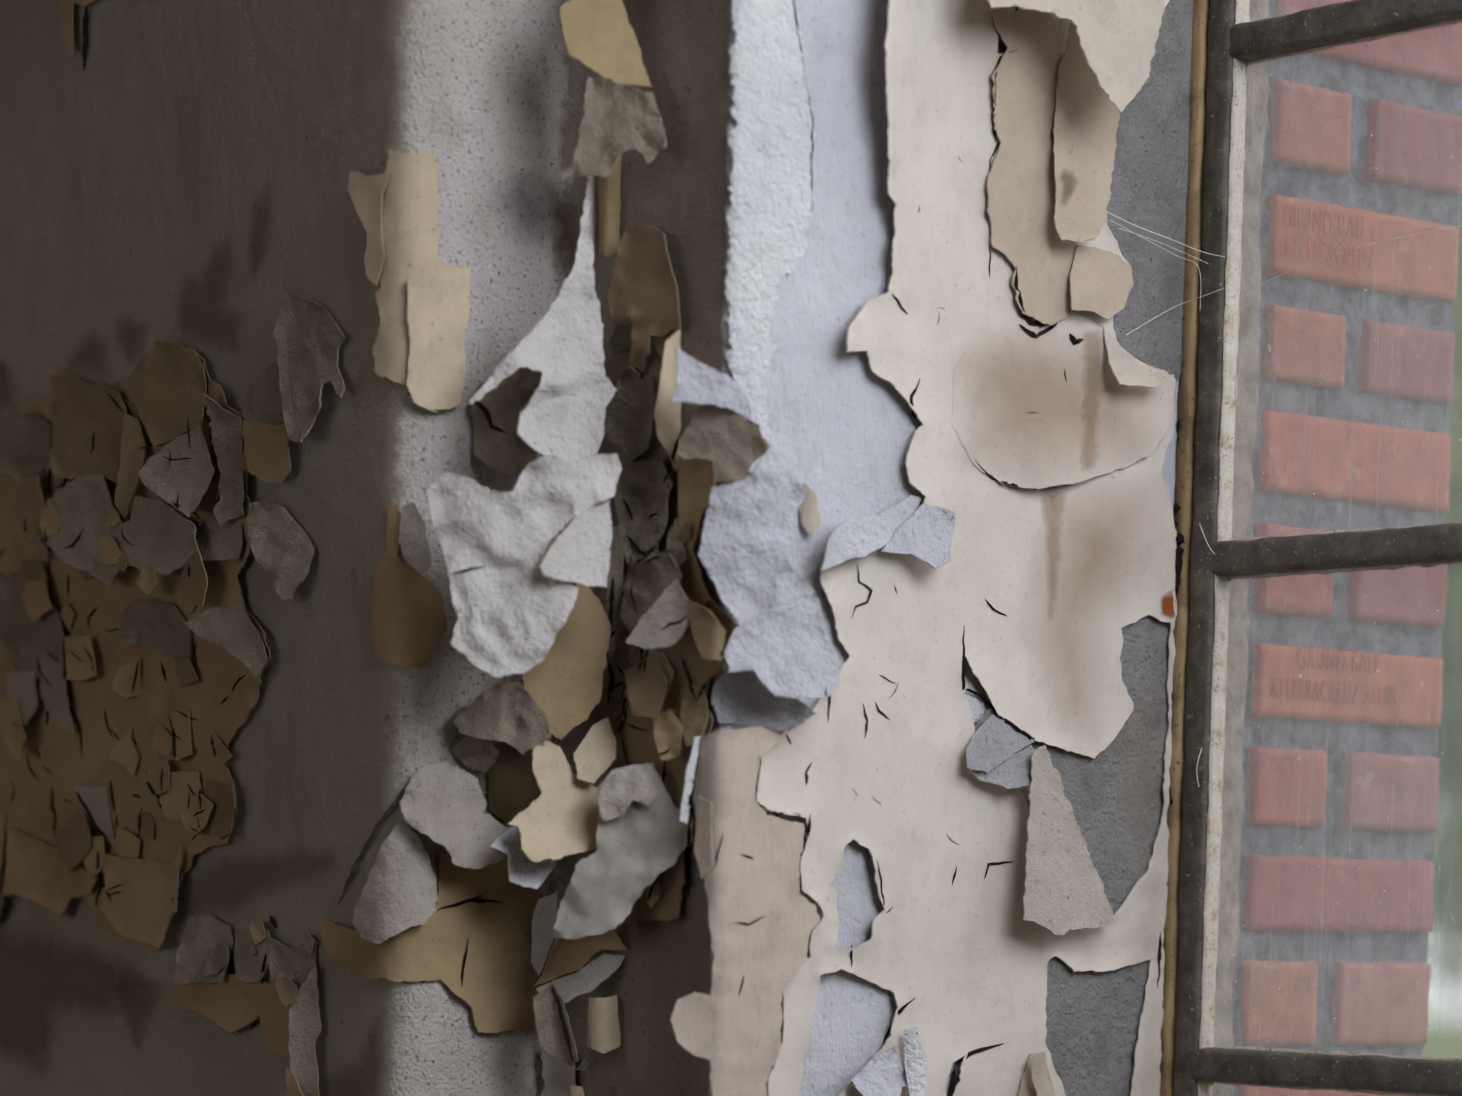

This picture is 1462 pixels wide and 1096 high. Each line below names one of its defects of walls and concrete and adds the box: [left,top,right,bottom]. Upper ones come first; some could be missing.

peeling [57,0,96,71]
peeling [171,0,1193,1096]
peeling [0,291,345,951]
crack [852,564,897,617]
crack [883,998,915,1044]
crack [948,1043,1004,1096]